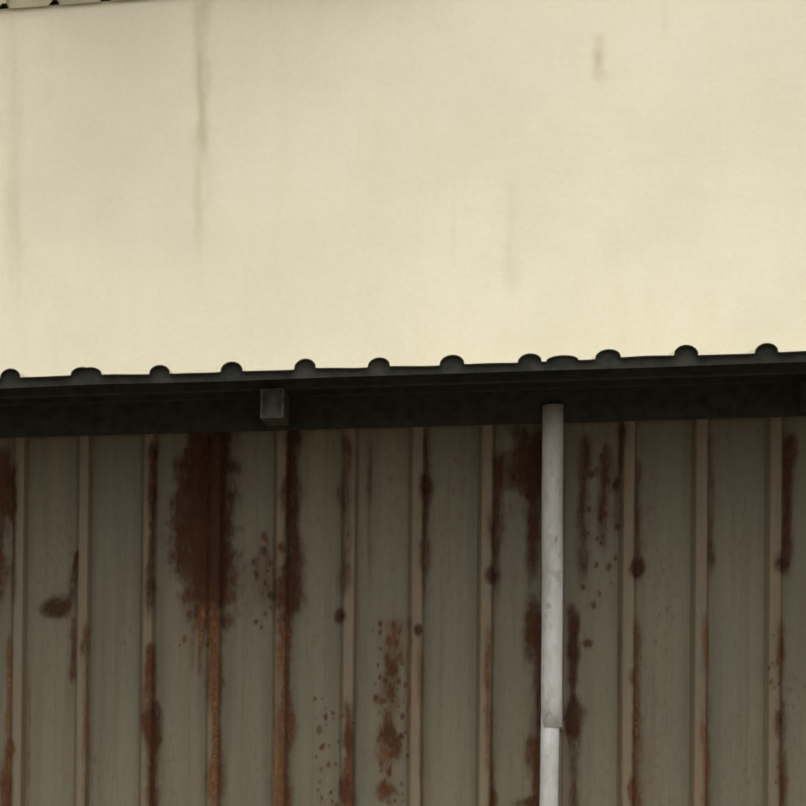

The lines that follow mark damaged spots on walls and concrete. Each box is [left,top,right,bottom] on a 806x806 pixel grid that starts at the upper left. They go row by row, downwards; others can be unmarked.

corrosion [145,442,158,608]
corrosion [421,436,432,571]
corrosion [485,426,542,583]
corrosion [0,636,15,806]
corrosion [43,551,89,756]
corrosion [142,644,161,806]
corrosion [169,432,239,806]
corrosion [264,430,303,806]
corrosion [373,621,408,804]
corrosion [517,601,542,806]
corrosion [564,606,592,746]
corrosion [628,623,641,806]